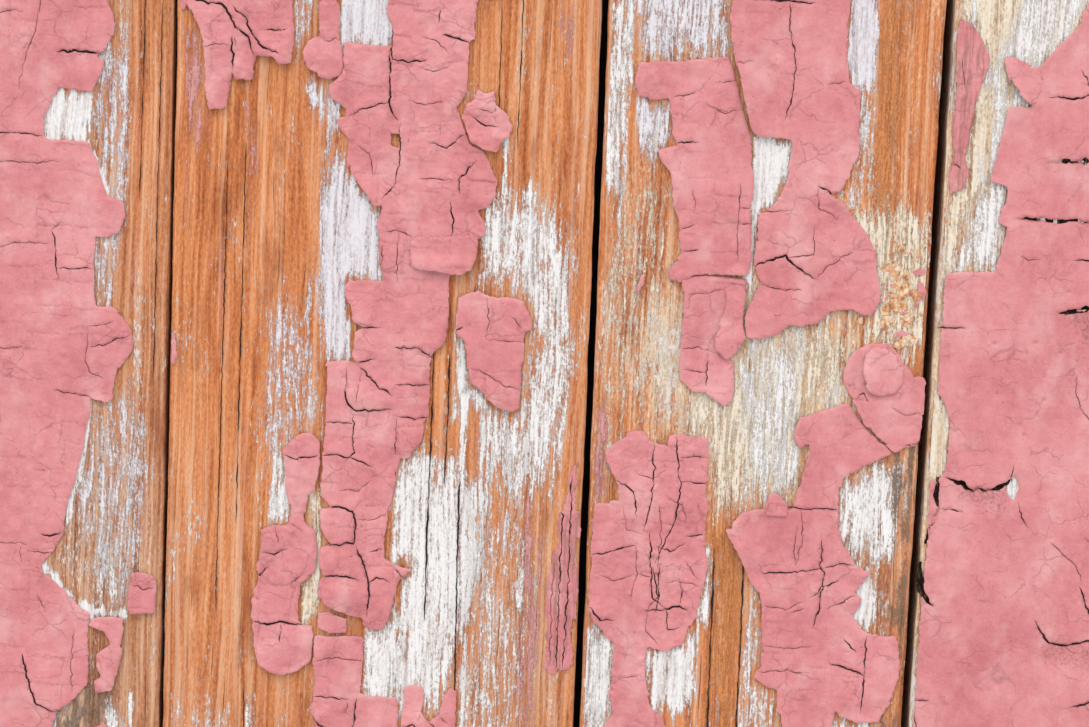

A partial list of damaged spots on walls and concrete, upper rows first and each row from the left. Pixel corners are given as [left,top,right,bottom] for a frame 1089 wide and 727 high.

crack [1050,70,1089,100]
peeling [635,0,881,406]
crack [1024,216,1088,224]
crack [1061,157,1089,165]
peeling [0,0,157,727]
peeling [180,0,532,727]
crack [1059,306,1089,315]
peeling [543,430,709,727]
peeling [726,343,949,727]
crack [916,466,1027,606]
crack [1035,621,1089,647]
crack [1051,539,1089,614]